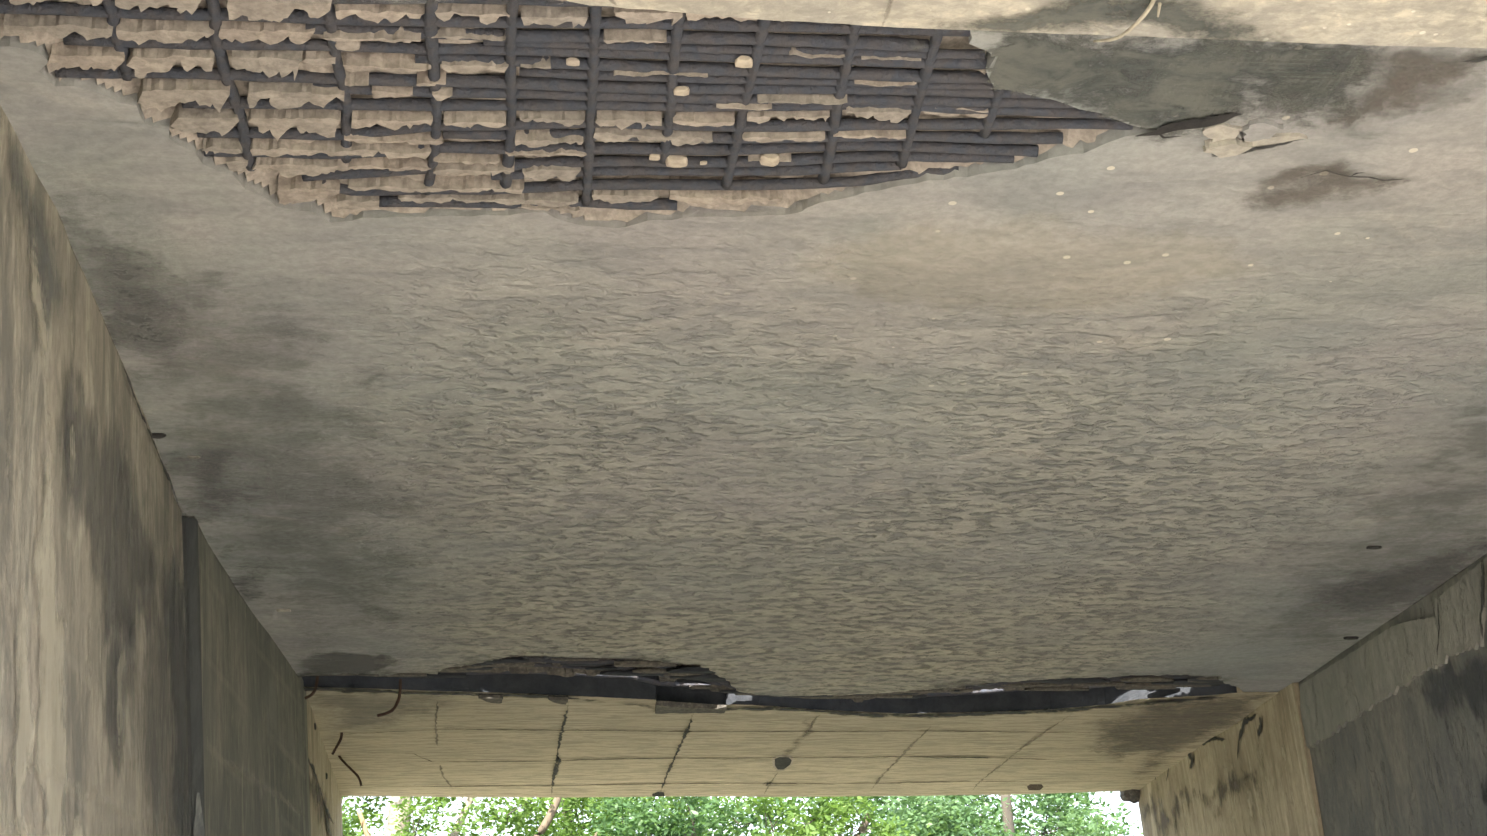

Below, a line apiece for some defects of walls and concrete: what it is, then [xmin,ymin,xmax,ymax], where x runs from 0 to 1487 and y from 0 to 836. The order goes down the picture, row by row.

spalling [0,0,1133,222]
peeling [1202,118,1308,158]
leakage [12,150,60,351]
leakage [15,466,83,836]
leakage [117,646,127,760]
crack [551,710,586,792]
crack [662,720,693,788]
spalling [302,653,1237,717]
crack [876,722,1059,786]
leakage [1098,695,1266,773]
leakage [1422,659,1487,720]